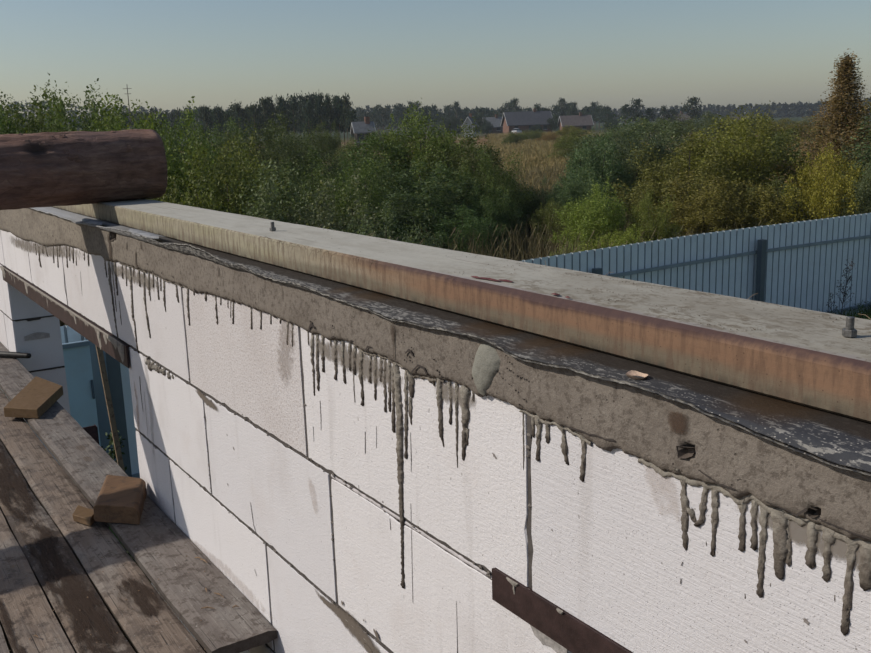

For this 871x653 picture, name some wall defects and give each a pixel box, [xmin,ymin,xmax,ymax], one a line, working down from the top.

damp [11,238,89,268]
damp [104,236,234,353]
damp [250,307,293,347]
damp [307,326,415,589]
damp [432,377,475,468]
damp [522,413,569,471]
damp [579,435,587,482]
damp [674,467,720,557]
damp [733,496,871,636]